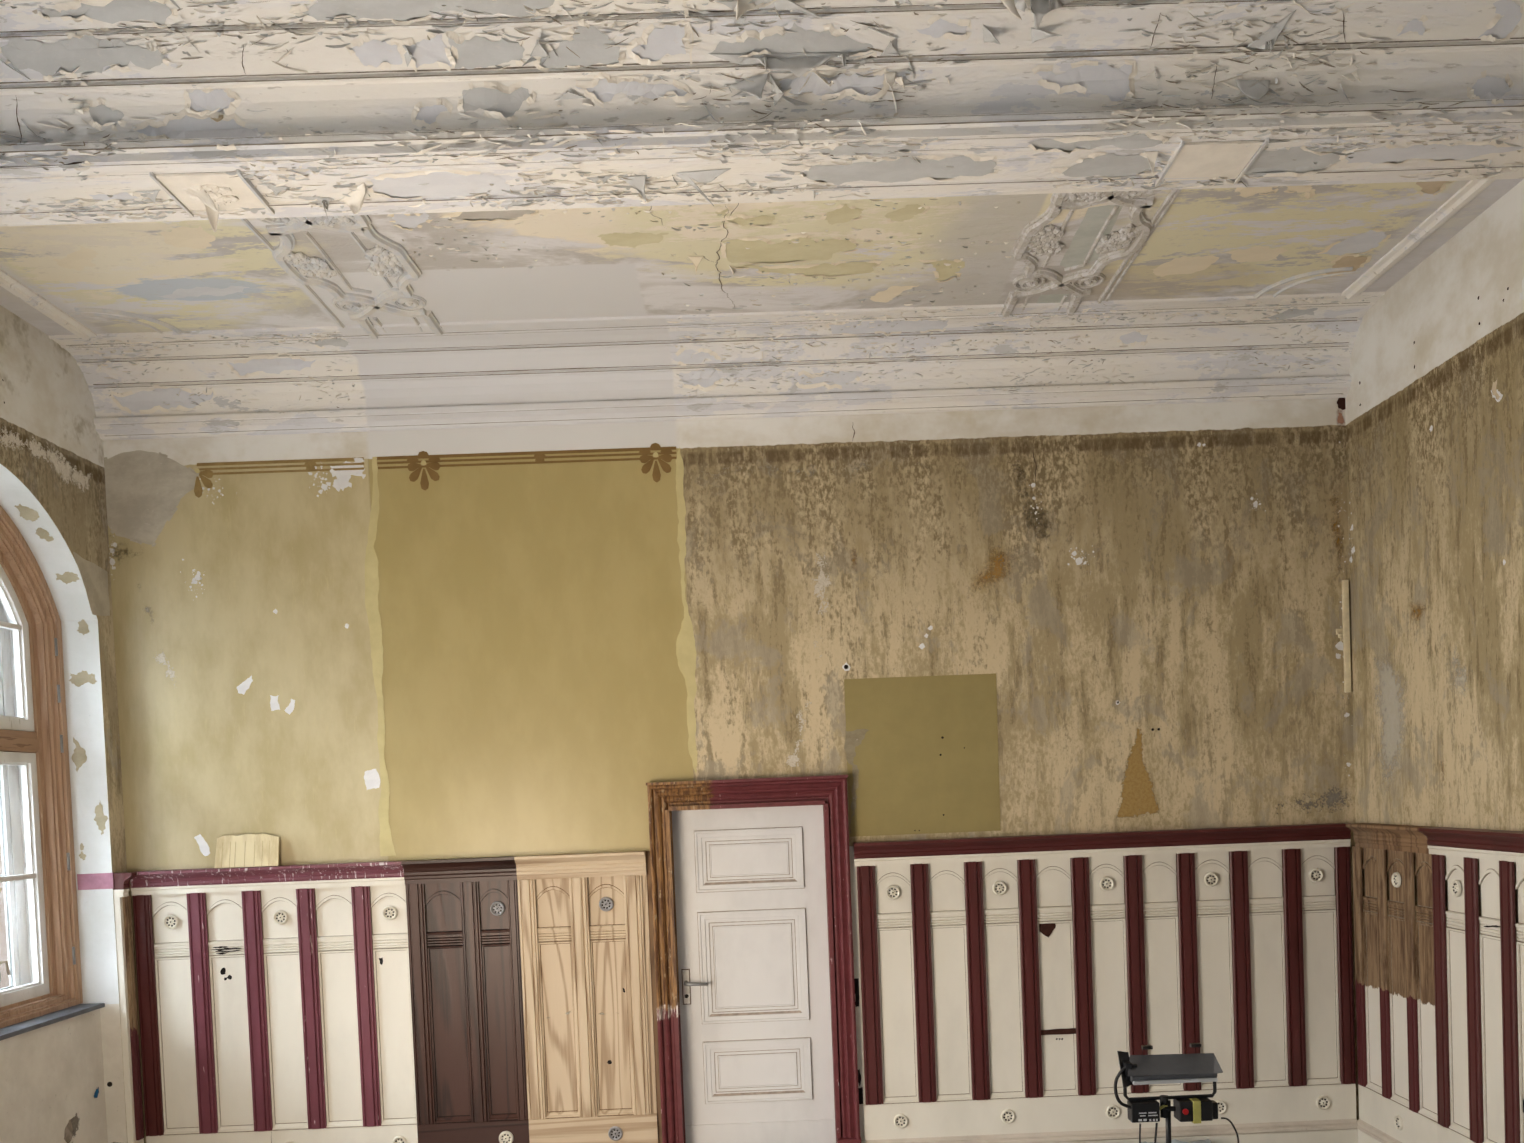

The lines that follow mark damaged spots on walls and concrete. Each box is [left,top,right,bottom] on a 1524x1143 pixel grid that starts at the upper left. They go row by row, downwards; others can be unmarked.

crack [704,203,739,306]
peeling [1316,229,1391,277]
peeling [1491,380,1503,402]
spalling [1336,398,1361,443]
peeling [15,504,54,542]
water stain [1013,464,1049,548]
peeling [56,536,117,635]
peeling [180,559,205,598]
peeling [69,670,97,687]
water stain [1117,729,1159,818]